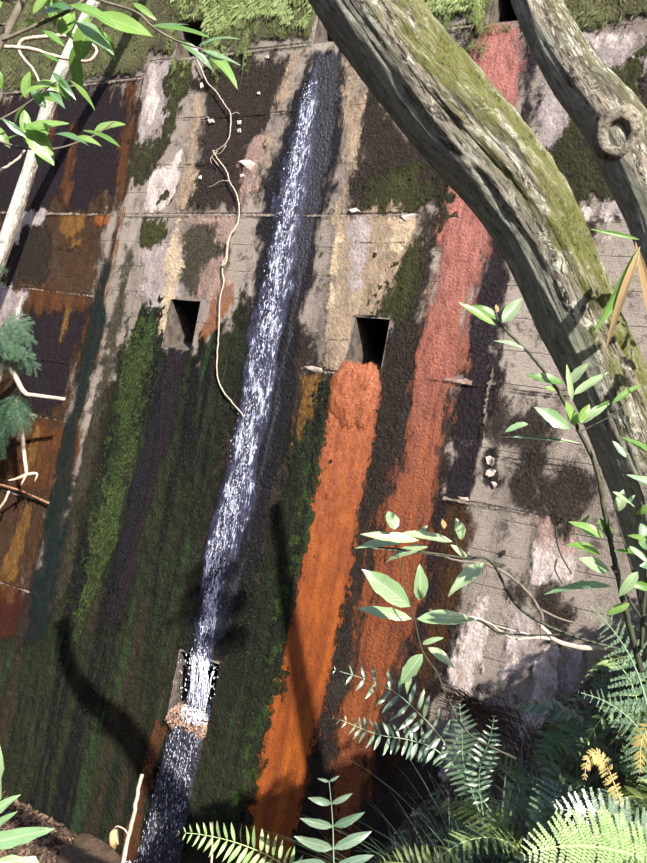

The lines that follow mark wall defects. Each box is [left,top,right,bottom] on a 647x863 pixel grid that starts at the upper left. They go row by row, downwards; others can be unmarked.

water stain [455,22,479,61]
corrosion [0,78,149,642]
water stain [107,348,200,636]
corrosion [291,371,325,451]
water stain [136,42,606,863]
corrosion [404,496,476,724]
corrosion [383,728,414,775]